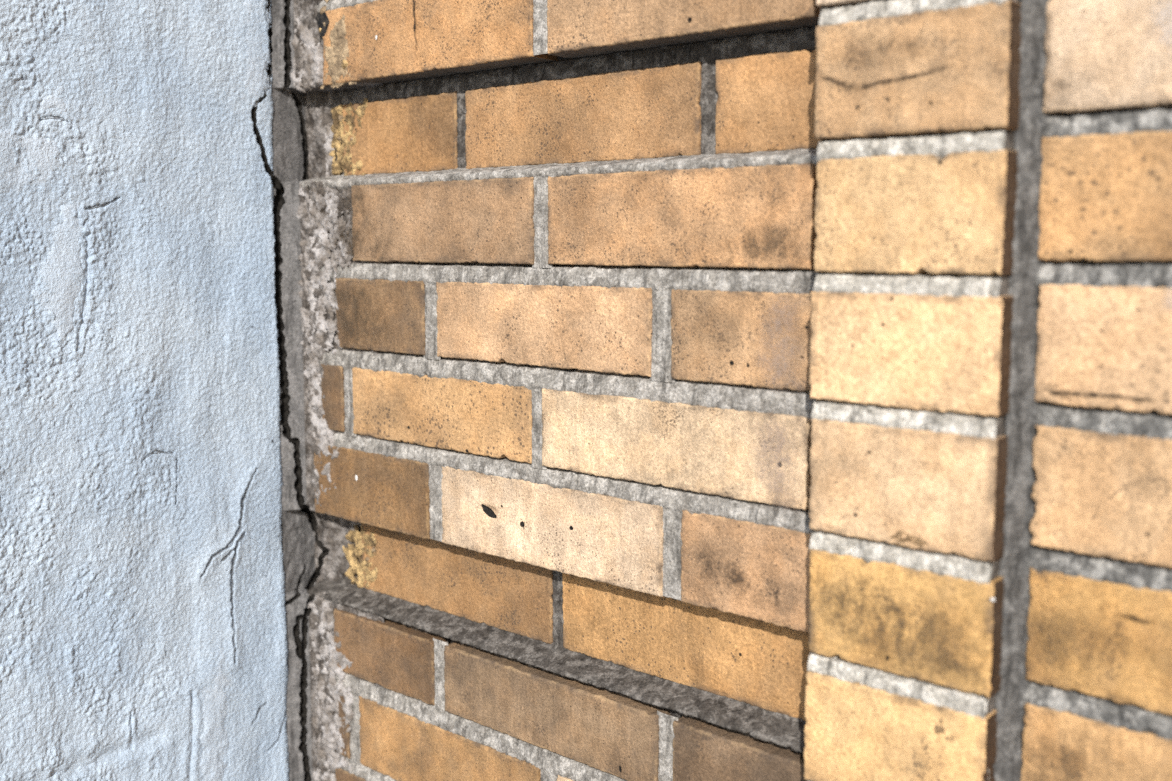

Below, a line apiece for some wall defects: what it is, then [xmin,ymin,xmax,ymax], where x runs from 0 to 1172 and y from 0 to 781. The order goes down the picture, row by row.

crack [201,468,257,661]
crack [251,0,329,781]